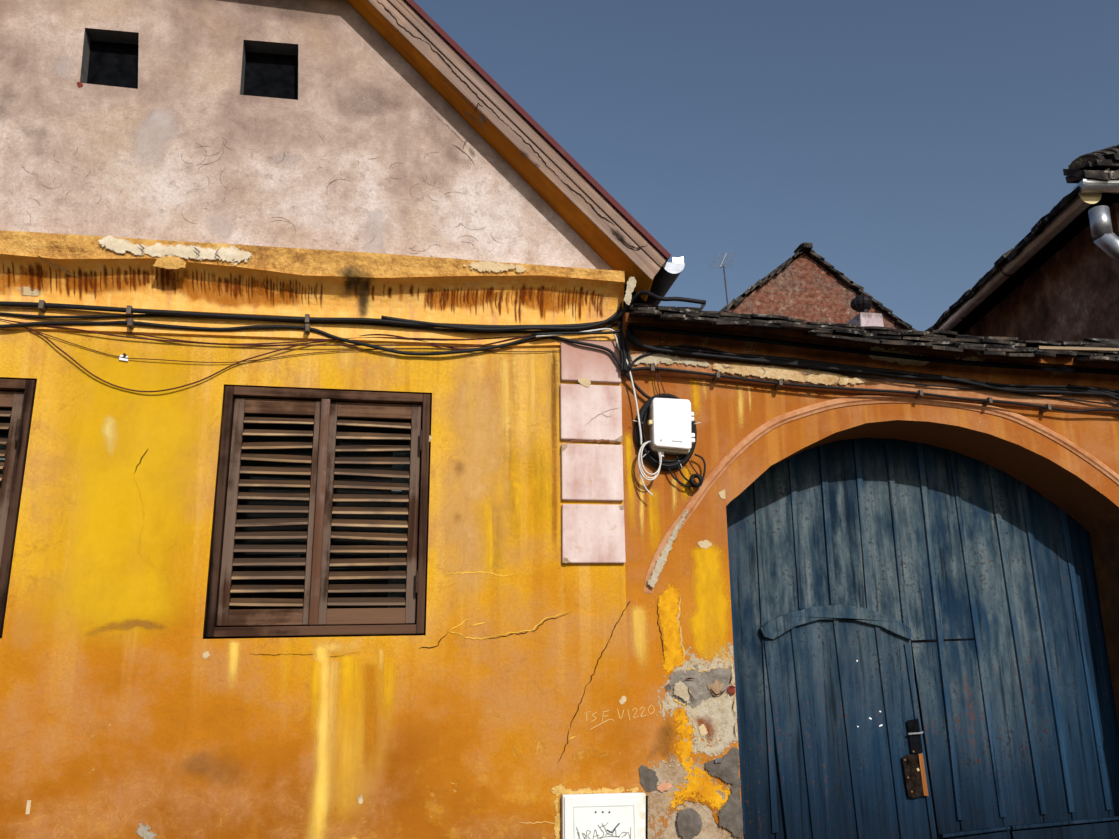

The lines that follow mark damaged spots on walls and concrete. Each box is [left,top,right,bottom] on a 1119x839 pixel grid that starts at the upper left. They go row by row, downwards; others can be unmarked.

corrosion [3,262,322,305]
peeling [631,352,867,385]
crack [134,448,170,572]
leakage [312,643,393,839]
crack [419,610,570,649]
crack [557,601,631,764]
flaking render [551,509,742,839]